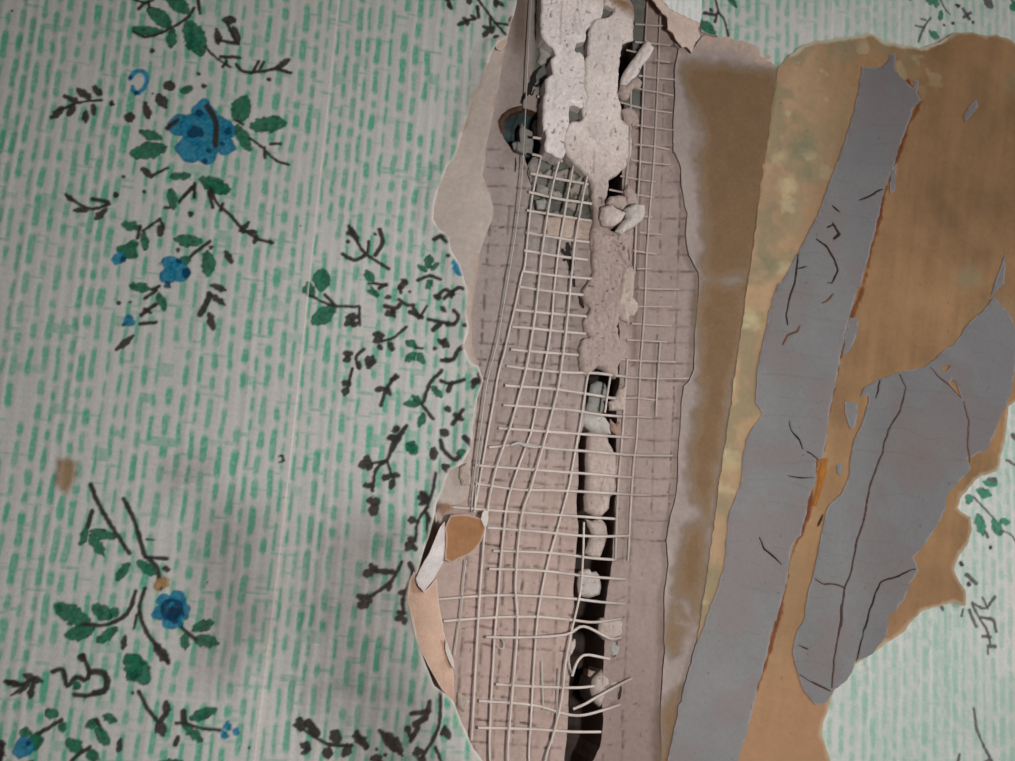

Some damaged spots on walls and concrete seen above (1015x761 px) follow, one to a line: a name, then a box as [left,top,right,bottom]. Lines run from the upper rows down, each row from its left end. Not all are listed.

crack [617,41,634,110]
peeling [433,25,511,366]
spalling [527,157,591,219]
crack [605,171,622,201]
crack [782,189,883,345]
damp [58,460,74,490]
peeling [436,403,477,508]
crack [587,365,620,452]
peeling [659,35,921,761]
crack [800,374,916,692]
peeling [792,255,1015,705]
crack [564,495,622,761]